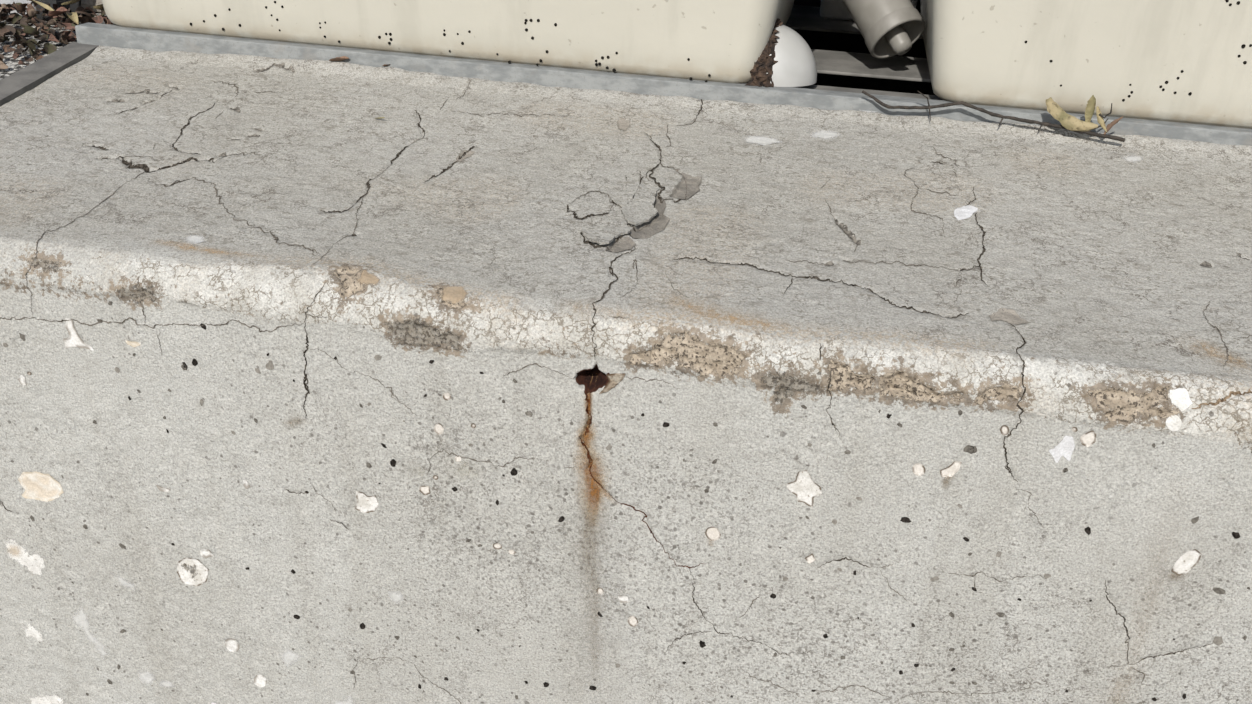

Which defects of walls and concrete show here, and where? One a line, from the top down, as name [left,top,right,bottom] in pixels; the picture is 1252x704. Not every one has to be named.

crack [646,99,703,177]
spalling [28,256,61,272]
spalling [117,284,156,303]
crack [0,79,567,416]
peeling [567,163,702,253]
crack [591,144,988,357]
spalling [600,330,744,394]
crack [428,437,534,484]
rust [583,389,600,502]
crack [1003,324,1043,527]
crack [504,363,1046,704]
crack [1105,580,1213,684]